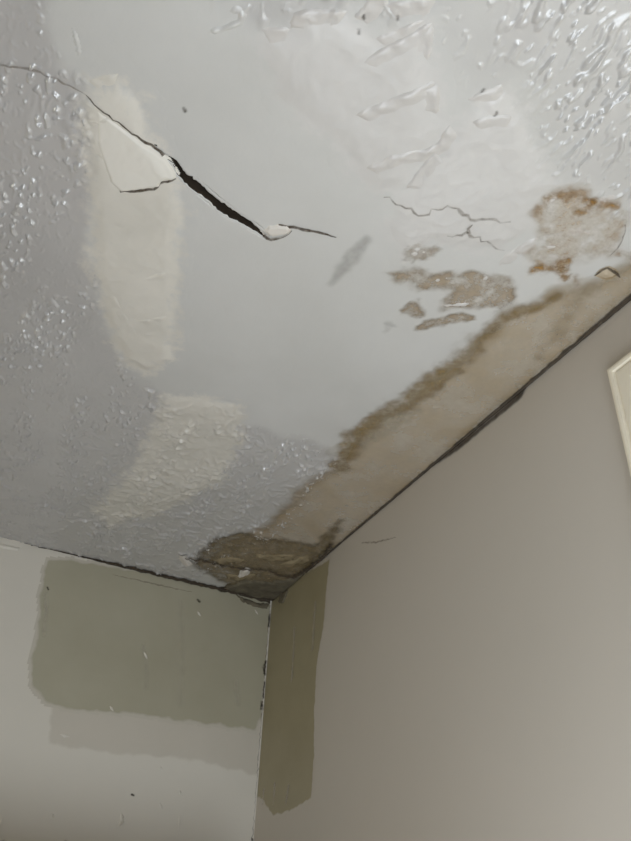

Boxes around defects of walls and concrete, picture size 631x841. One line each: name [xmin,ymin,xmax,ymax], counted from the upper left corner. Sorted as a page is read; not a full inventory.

crack [86,95,336,241]
damp [179,265,631,599]
crack [327,295,631,555]
crack [0,543,308,626]